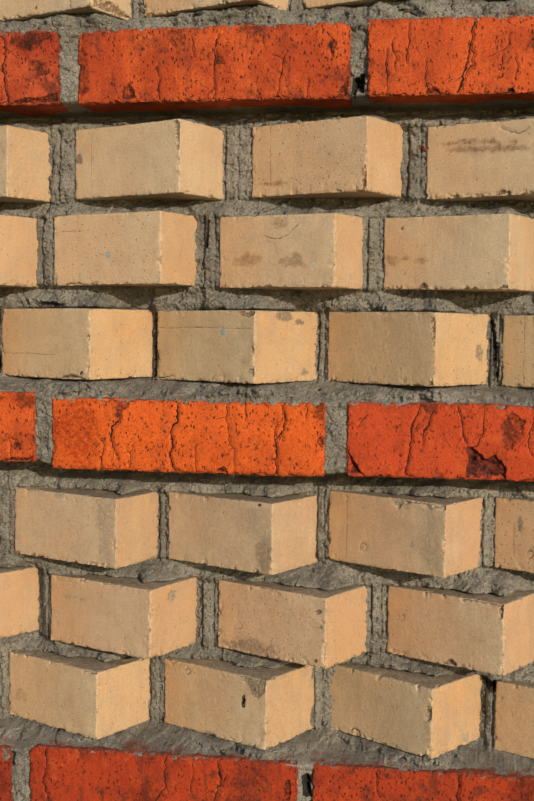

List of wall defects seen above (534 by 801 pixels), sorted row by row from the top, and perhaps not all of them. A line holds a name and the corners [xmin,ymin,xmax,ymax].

crack [0,36,14,102]
crack [385,9,437,94]
crack [456,19,519,93]
crack [97,420,134,469]
crack [165,403,179,471]
crack [274,406,308,474]
crack [399,406,437,474]
crack [456,408,489,448]
spalling [466,446,506,479]
spalling [501,413,525,449]